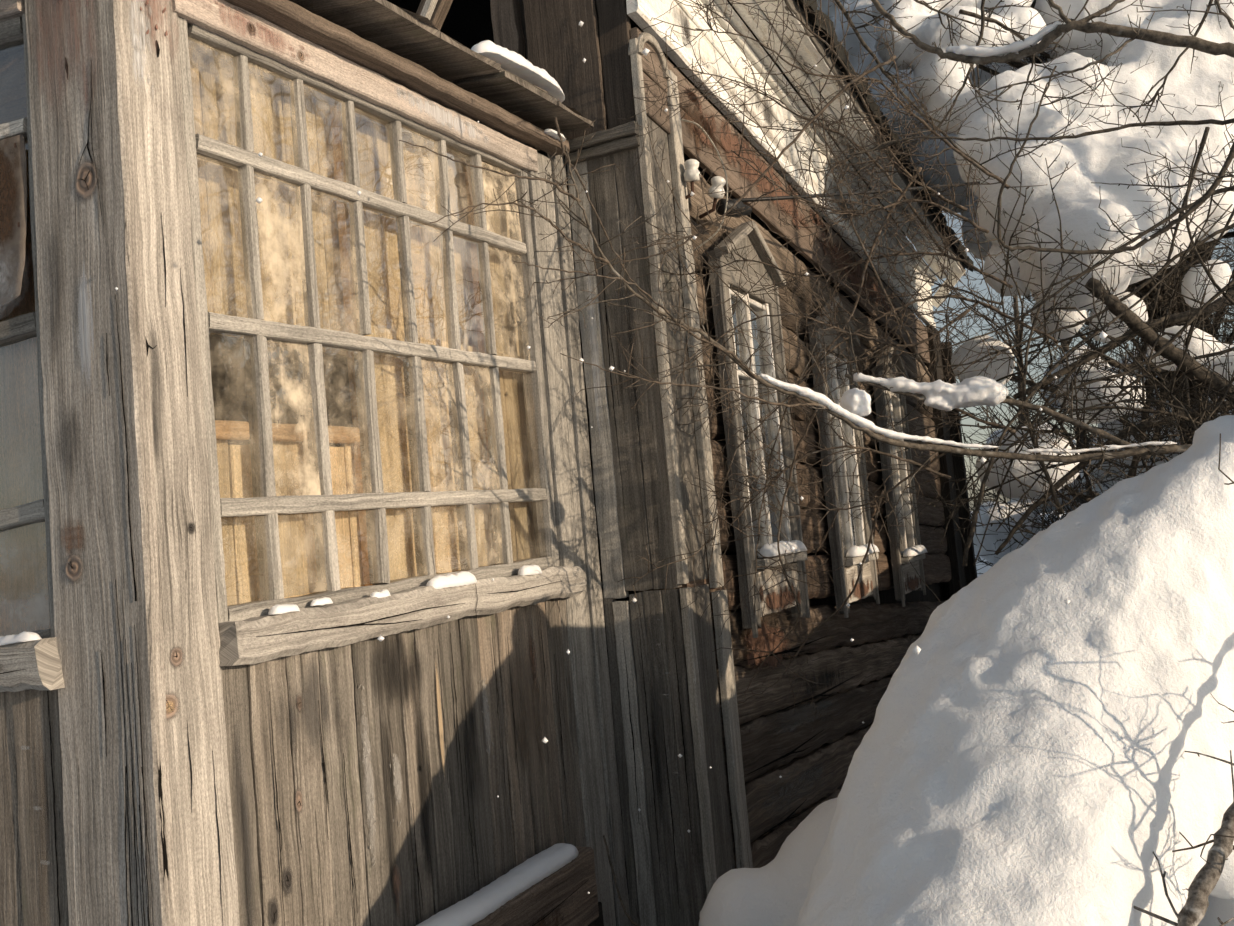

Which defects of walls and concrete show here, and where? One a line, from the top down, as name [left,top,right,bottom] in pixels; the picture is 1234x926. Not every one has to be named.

crack [65,57,102,217]
crack [100,214,223,926]